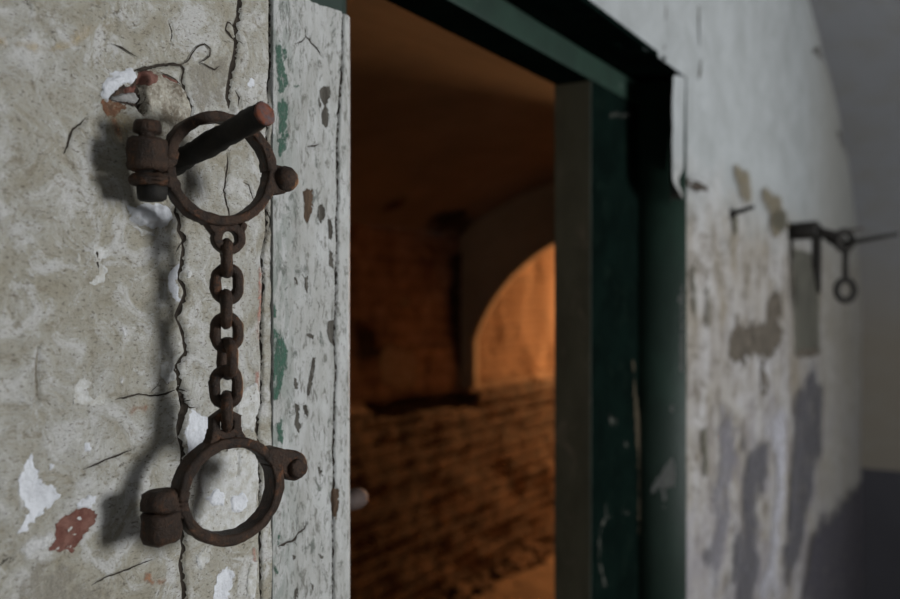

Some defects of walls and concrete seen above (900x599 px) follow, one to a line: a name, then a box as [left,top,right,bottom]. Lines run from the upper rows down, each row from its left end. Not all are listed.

crack [111,0,243,116]
crack [264,0,272,104]
spalling [100,68,191,136]
crack [115,207,195,463]
crack [221,156,270,506]
flaking render [728,284,783,396]
flaking render [184,409,208,453]
flaking render [235,382,260,432]
flaking render [18,454,61,533]
flaking render [49,495,98,553]
crack [178,530,187,599]
crack [258,520,306,596]